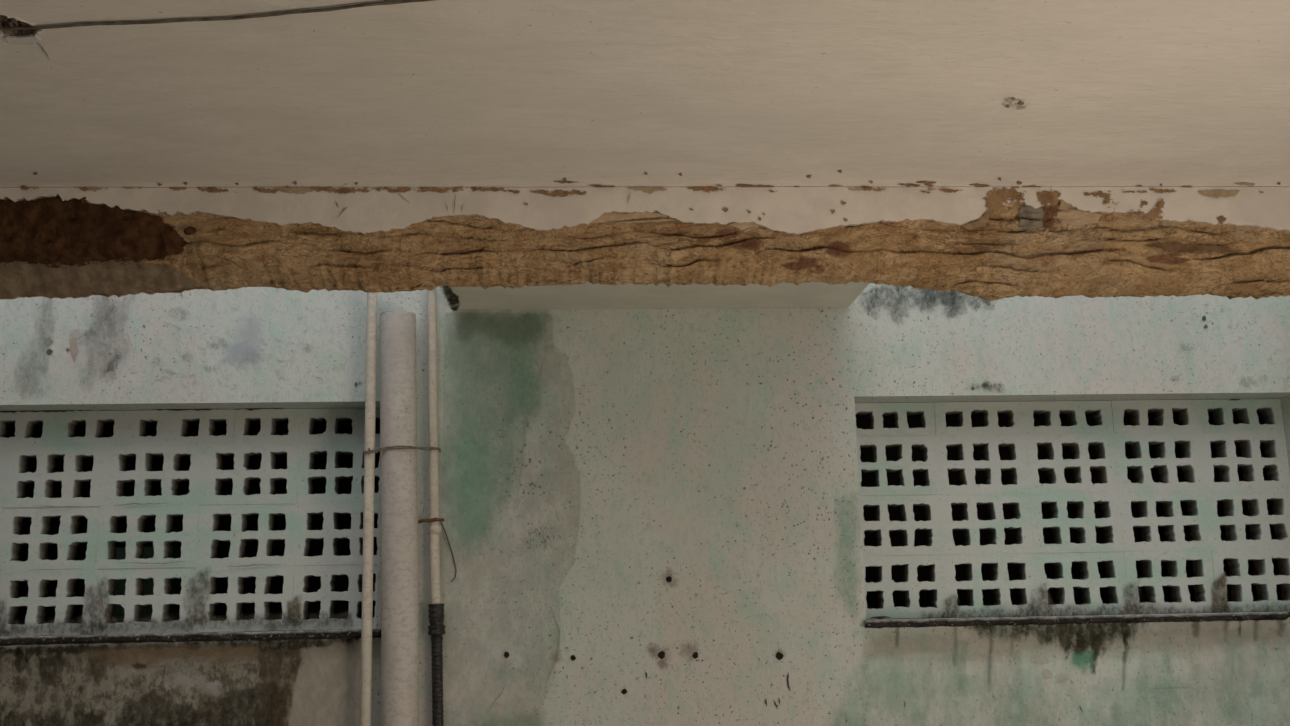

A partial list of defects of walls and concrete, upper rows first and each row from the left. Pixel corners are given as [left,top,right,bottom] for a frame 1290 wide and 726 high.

spalling [0,170,1290,343]
water stain [863,285,990,320]
water stain [0,572,361,726]